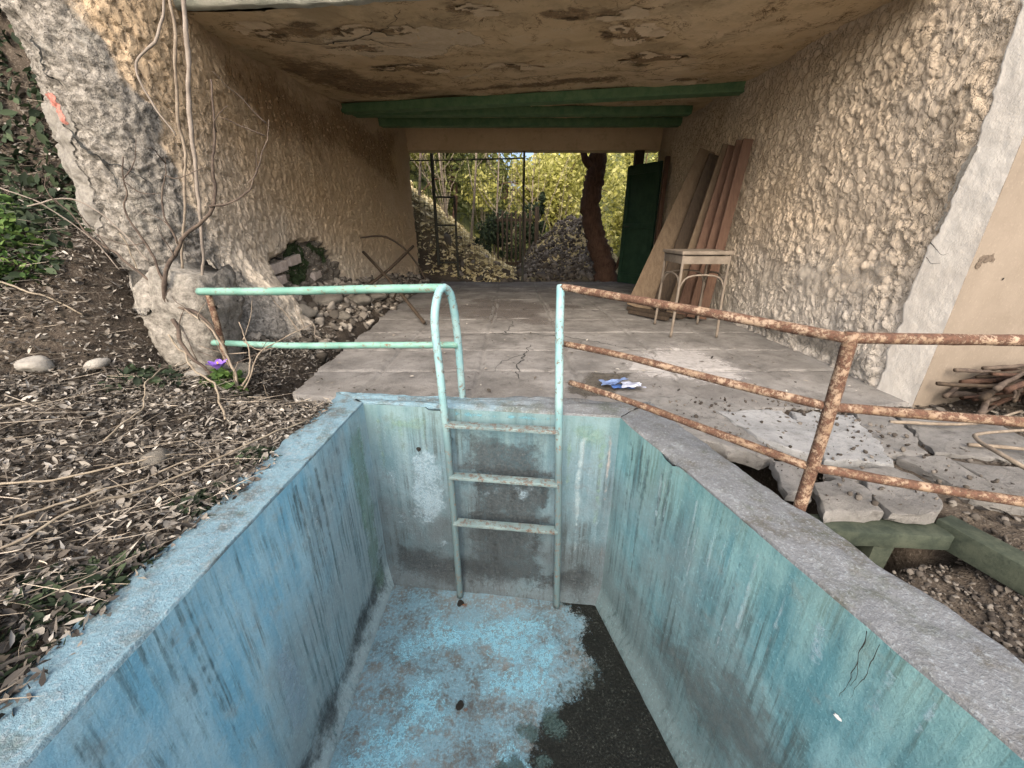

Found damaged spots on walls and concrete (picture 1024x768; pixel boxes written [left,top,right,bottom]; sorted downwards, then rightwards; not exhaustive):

peeling [234,20,484,76]
peeling [540,6,696,67]
water stain [399,434,588,589]
water stain [342,576,385,676]
water stain [494,602,678,768]
crack [839,631,880,697]
water stain [302,688,337,768]